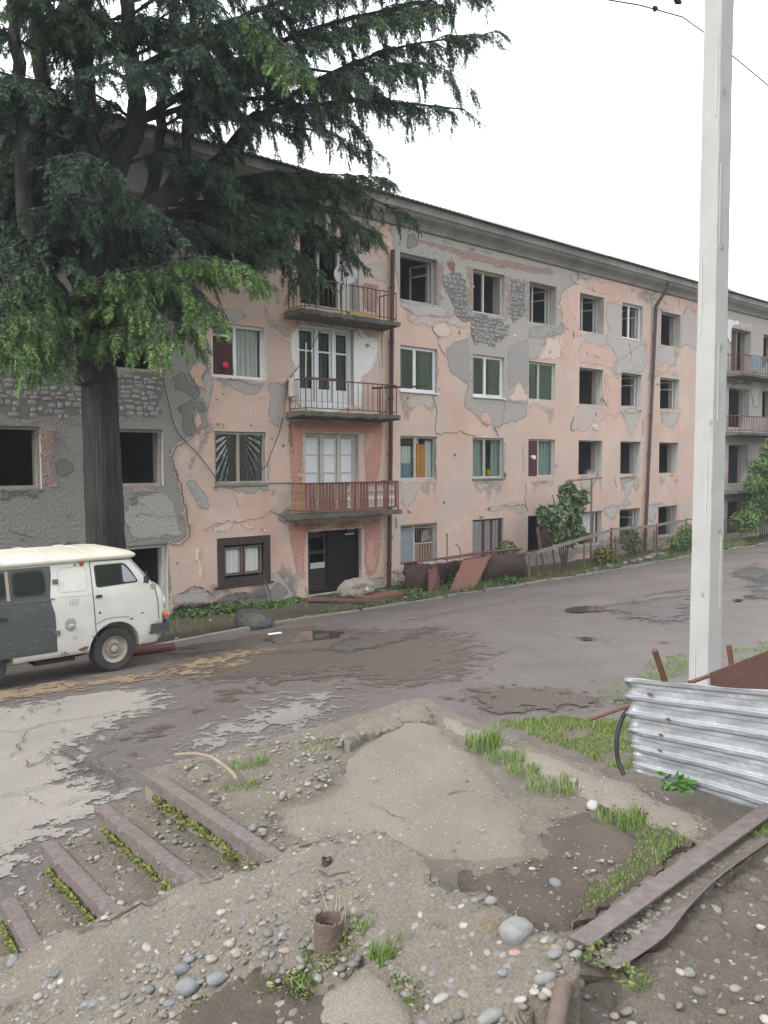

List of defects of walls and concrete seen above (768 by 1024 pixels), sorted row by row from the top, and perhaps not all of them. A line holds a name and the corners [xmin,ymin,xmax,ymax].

spalling [125,161,170,193]
spalling [52,267,72,293]
spalling [362,225,697,436]
spalling [0,413,86,549]
spalling [119,306,379,546]
spalling [266,573,308,599]